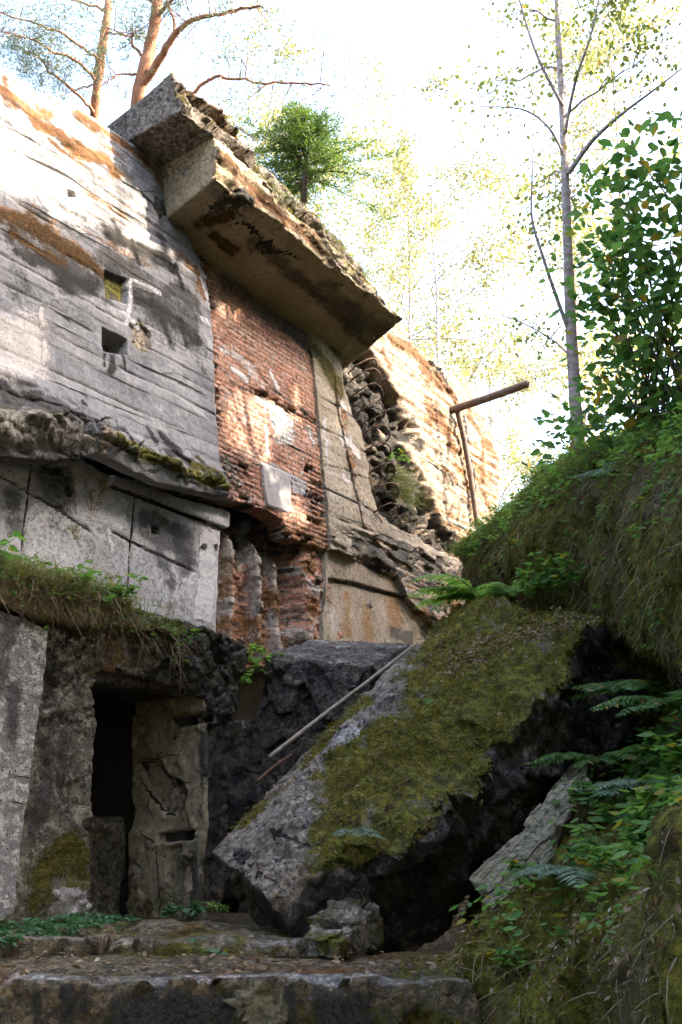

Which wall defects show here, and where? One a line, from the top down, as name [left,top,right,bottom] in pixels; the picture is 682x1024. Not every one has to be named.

rust [0,75,20,110]
rust [73,109,100,131]
rust [29,116,112,168]
rust [381,333,500,515]
spalling [219,455,243,488]
peeling [207,514,225,527]
crack [140,754,191,917]